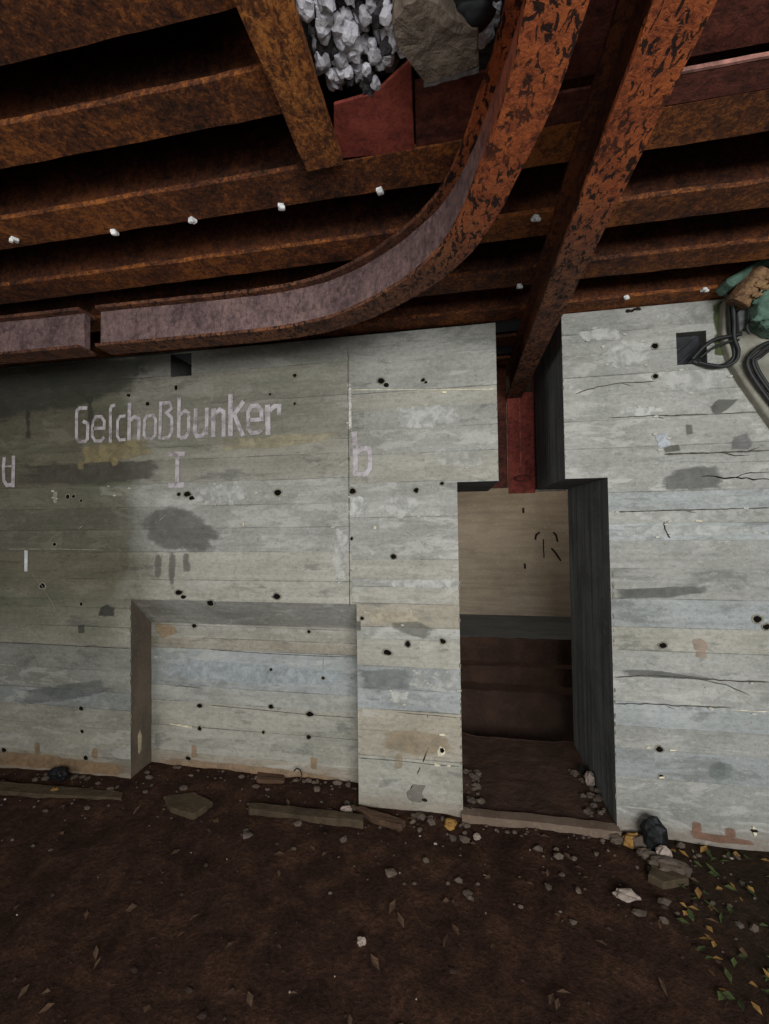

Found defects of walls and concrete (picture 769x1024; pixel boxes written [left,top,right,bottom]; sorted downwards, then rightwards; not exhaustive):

crack [665,447,769,481]
crack [615,675,769,709]